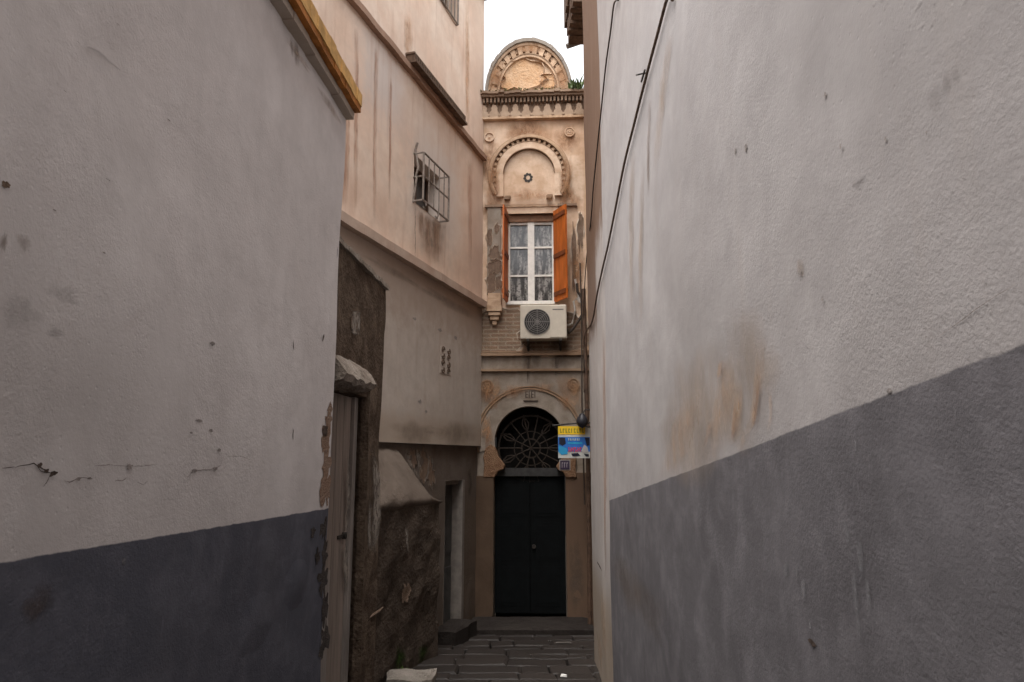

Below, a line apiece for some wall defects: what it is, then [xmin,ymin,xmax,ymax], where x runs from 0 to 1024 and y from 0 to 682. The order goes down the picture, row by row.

spalling [500,58,557,91]
spalling [484,222,502,293]
crack [6,463,157,487]
crack [187,456,250,482]
peeling [311,401,333,660]